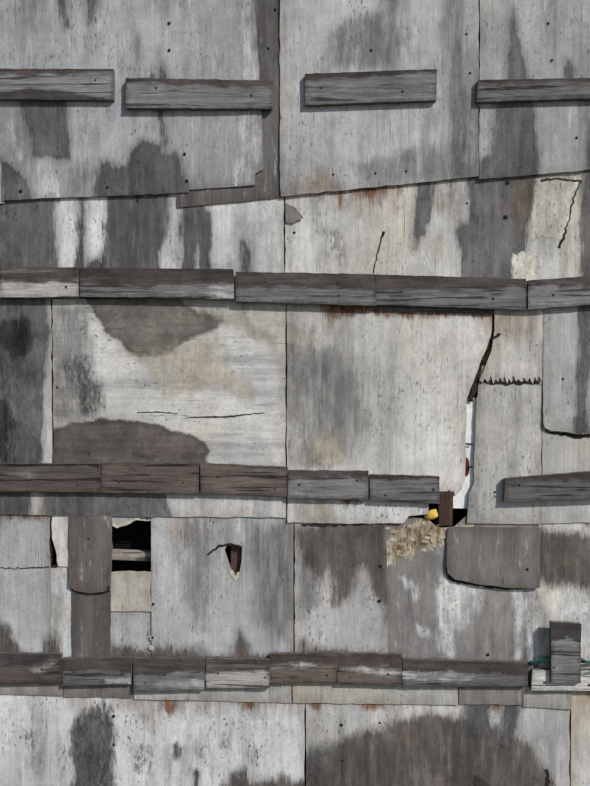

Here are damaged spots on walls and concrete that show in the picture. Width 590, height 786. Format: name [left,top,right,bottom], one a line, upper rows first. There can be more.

damp [0,88,110,161]
damp [0,102,590,291]
crack [540,177,582,248]
crack [373,231,385,273]
damp [0,298,222,490]
crack [136,410,265,418]
crack [468,314,501,402]
damp [573,305,590,435]
spalling [112,518,151,528]
spalling [386,518,474,567]
damp [222,704,556,786]
crack [543,769,551,786]